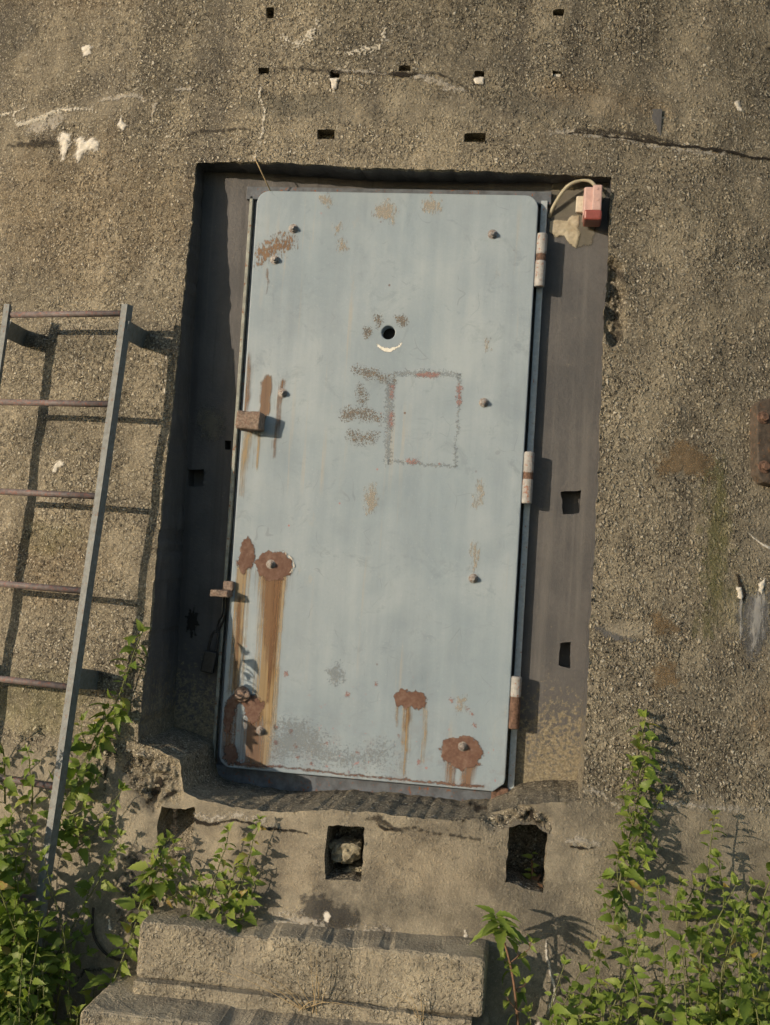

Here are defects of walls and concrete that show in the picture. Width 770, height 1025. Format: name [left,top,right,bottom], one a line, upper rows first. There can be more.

water stain [58,132,99,161]
crack [548,127,770,160]
corrosion [255,231,298,278]
spalling [603,258,626,348]
corrosion [244,363,285,448]
water stain [735,574,770,659]
corrosion [222,536,484,788]
spalling [122,750,183,813]
crack [151,808,306,909]